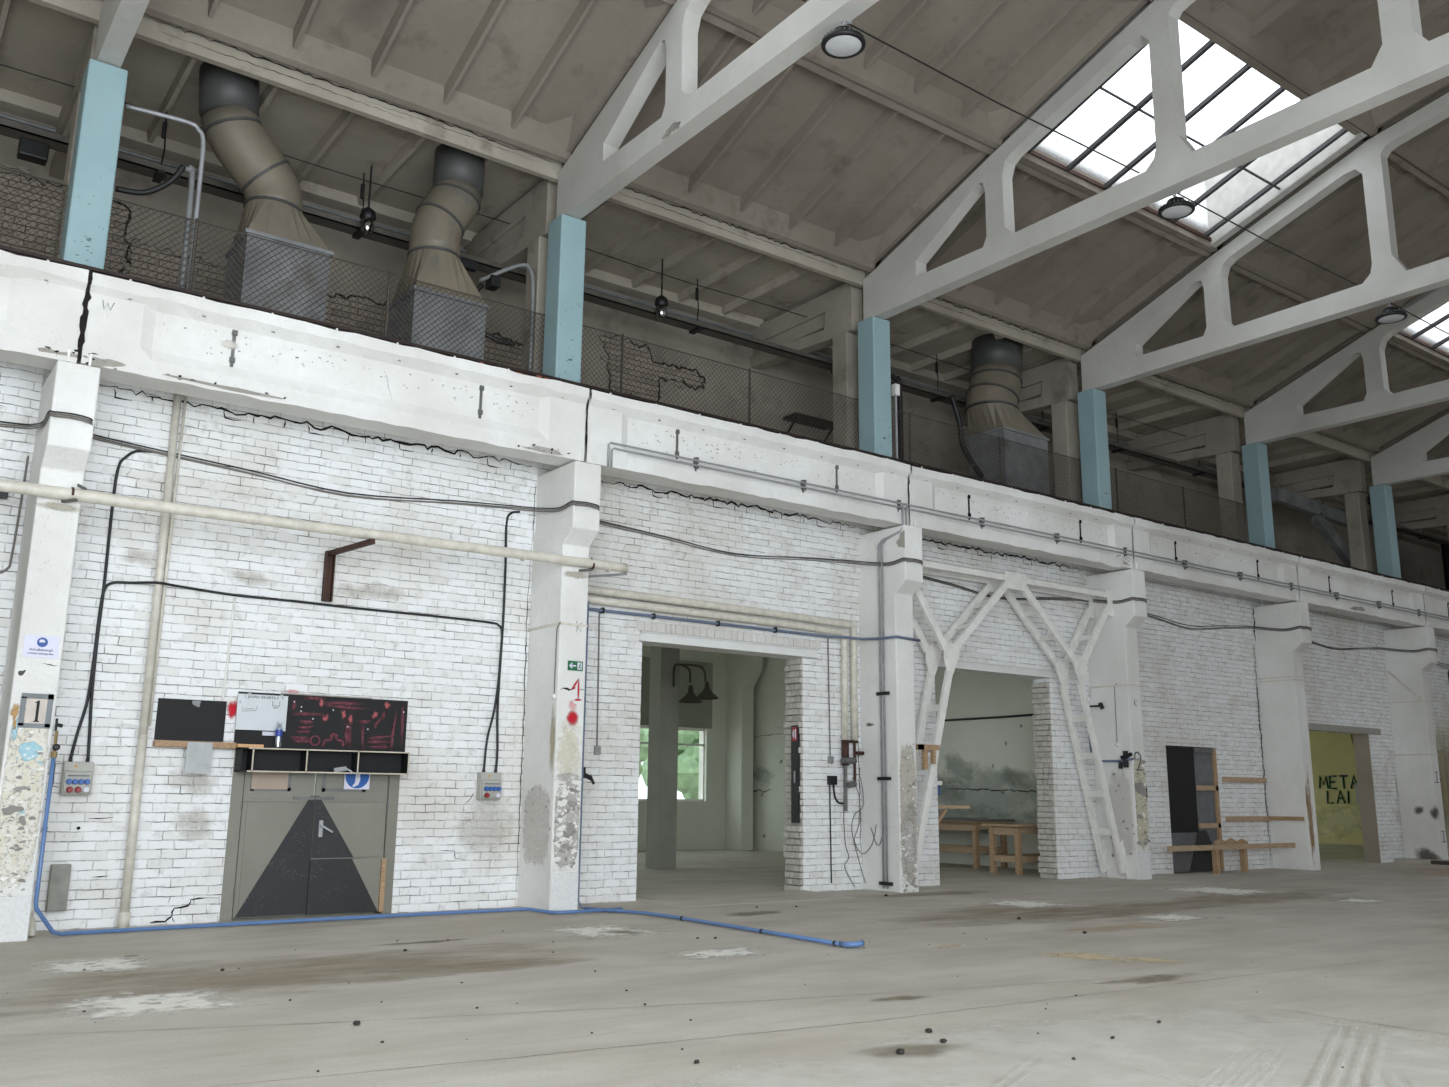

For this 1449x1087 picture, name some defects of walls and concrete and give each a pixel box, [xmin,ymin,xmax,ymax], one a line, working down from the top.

flaking render [0,163,227,298]
flaking render [598,335,706,401]
crack [66,270,536,879]
peeling [0,710,49,897]
peeling [522,773,582,869]
peeling [1110,757,1151,857]
water stain [1416,743,1449,860]